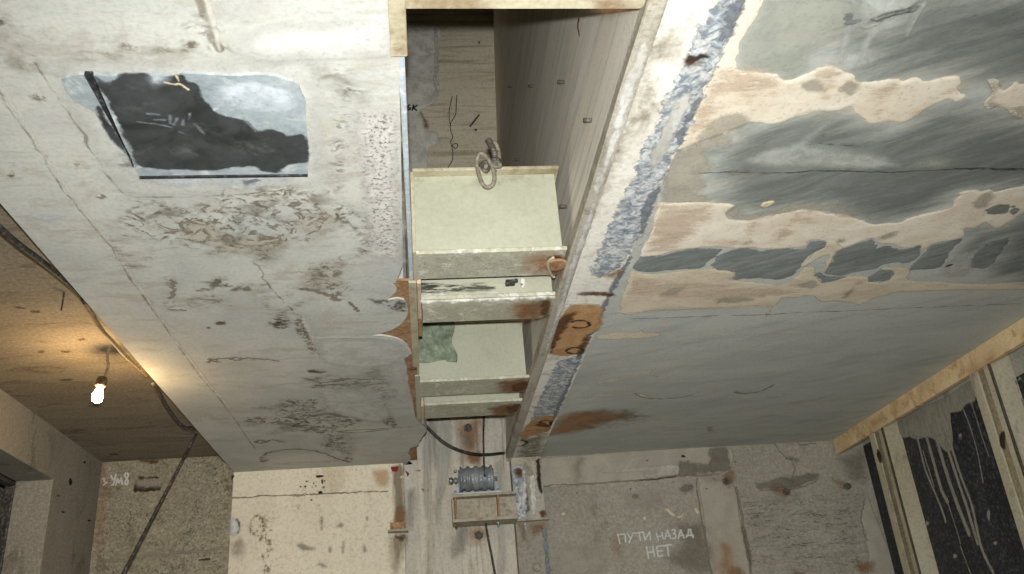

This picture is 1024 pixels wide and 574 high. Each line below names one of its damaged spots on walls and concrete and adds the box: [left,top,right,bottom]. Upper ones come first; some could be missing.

peeling [589,0,1024,320]
crack [699,143,1024,174]
water stain [127,190,355,260]
corrosion [520,292,614,356]
water stain [247,371,388,463]
corrosion [520,412,625,440]